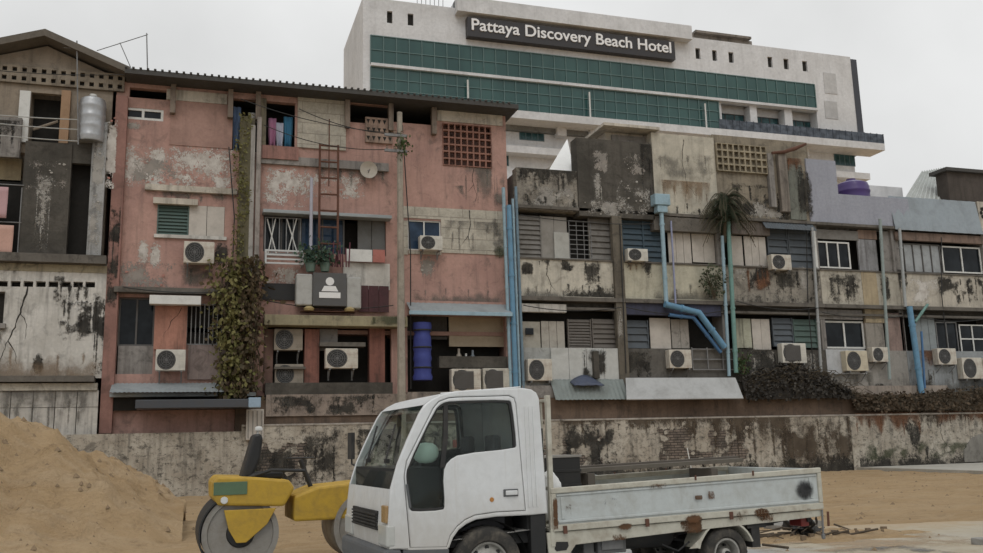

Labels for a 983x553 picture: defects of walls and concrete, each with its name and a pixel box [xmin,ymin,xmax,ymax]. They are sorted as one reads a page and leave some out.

water stain [36,176,53,250]
peeling [89,117,235,252]
peeling [262,167,365,207]
water stain [517,167,577,208]
water stain [0,205,121,376]
water stain [521,260,614,297]
water stain [742,268,800,303]
water stain [810,267,859,304]
water stain [938,277,983,304]
crack [0,287,28,364]
water stain [256,430,340,482]
water stain [562,411,983,475]